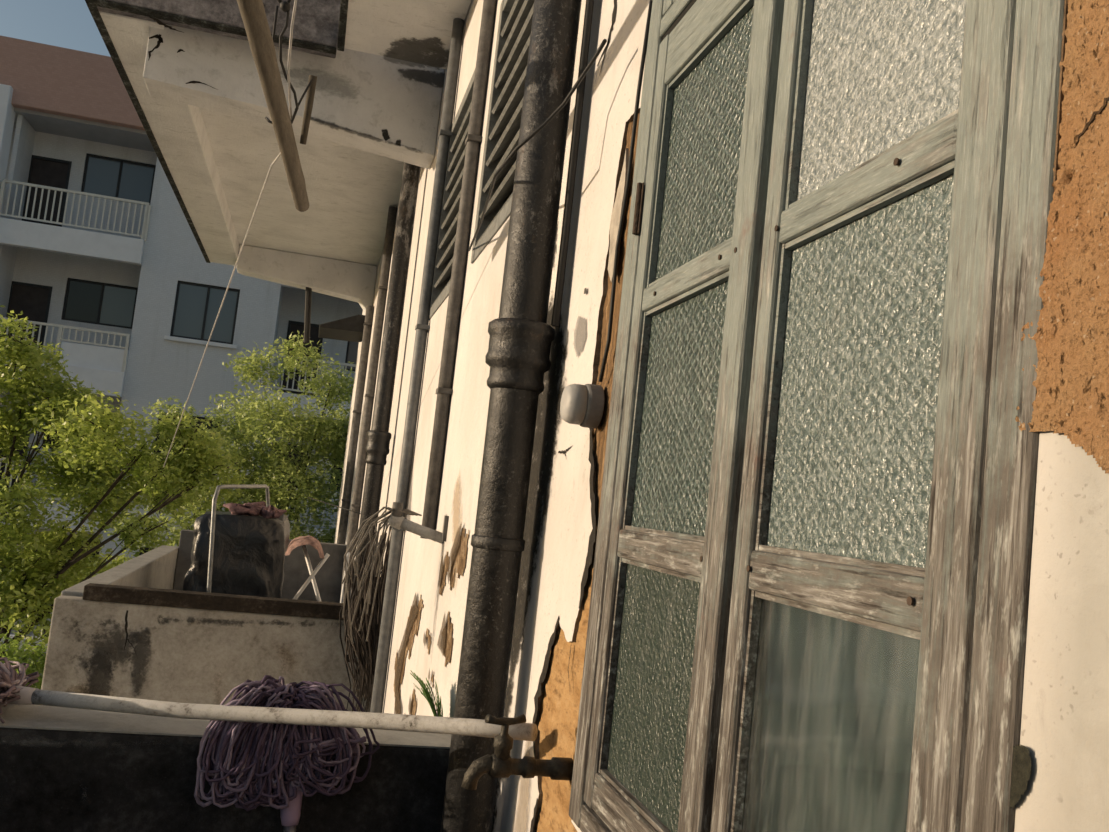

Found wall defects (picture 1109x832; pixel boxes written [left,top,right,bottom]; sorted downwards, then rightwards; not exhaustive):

damp [383,37,450,88]
flaking render [1015,0,1109,474]
flaking render [532,108,640,764]
flaking render [438,523,469,595]
damp [74,620,151,696]
damp [159,615,244,626]
flaking render [394,593,453,715]
flaking render [530,776,577,832]